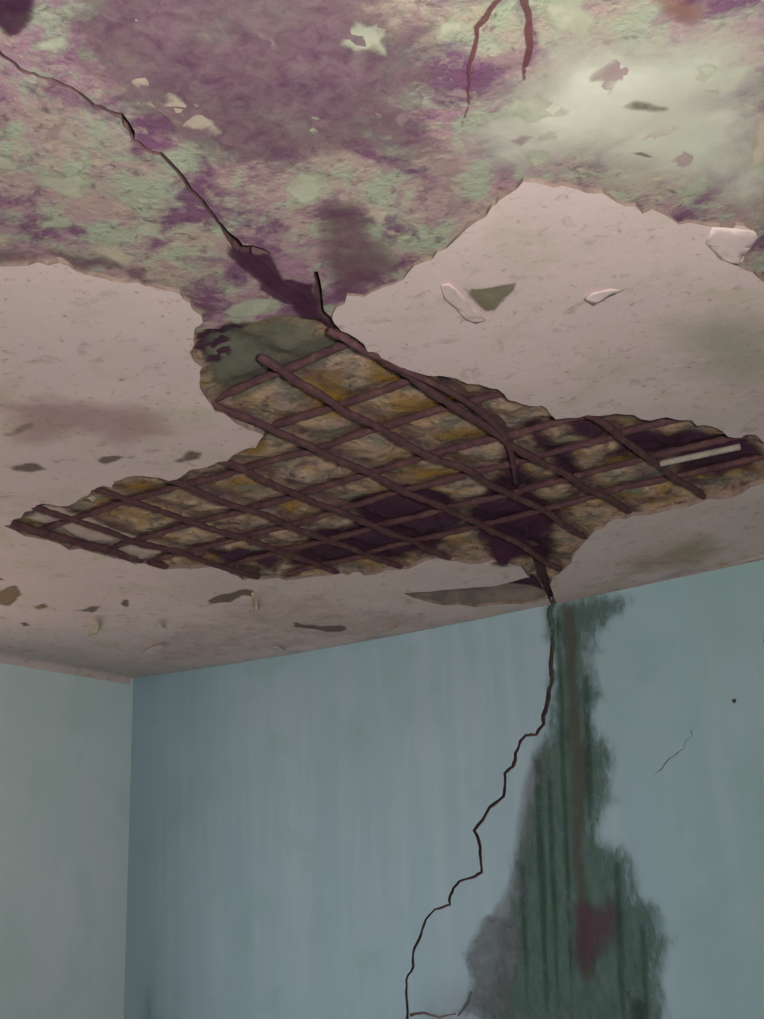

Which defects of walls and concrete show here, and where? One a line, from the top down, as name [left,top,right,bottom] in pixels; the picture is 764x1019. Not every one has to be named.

damp [0,0,32,36]
crack [0,51,271,256]
damp [77,0,428,158]
crack [462,0,534,123]
damp [488,42,760,197]
crack [314,271,339,329]
peeling [0,0,764,611]
crack [435,376,517,460]
crack [405,541,556,1019]
damp [466,597,666,1019]